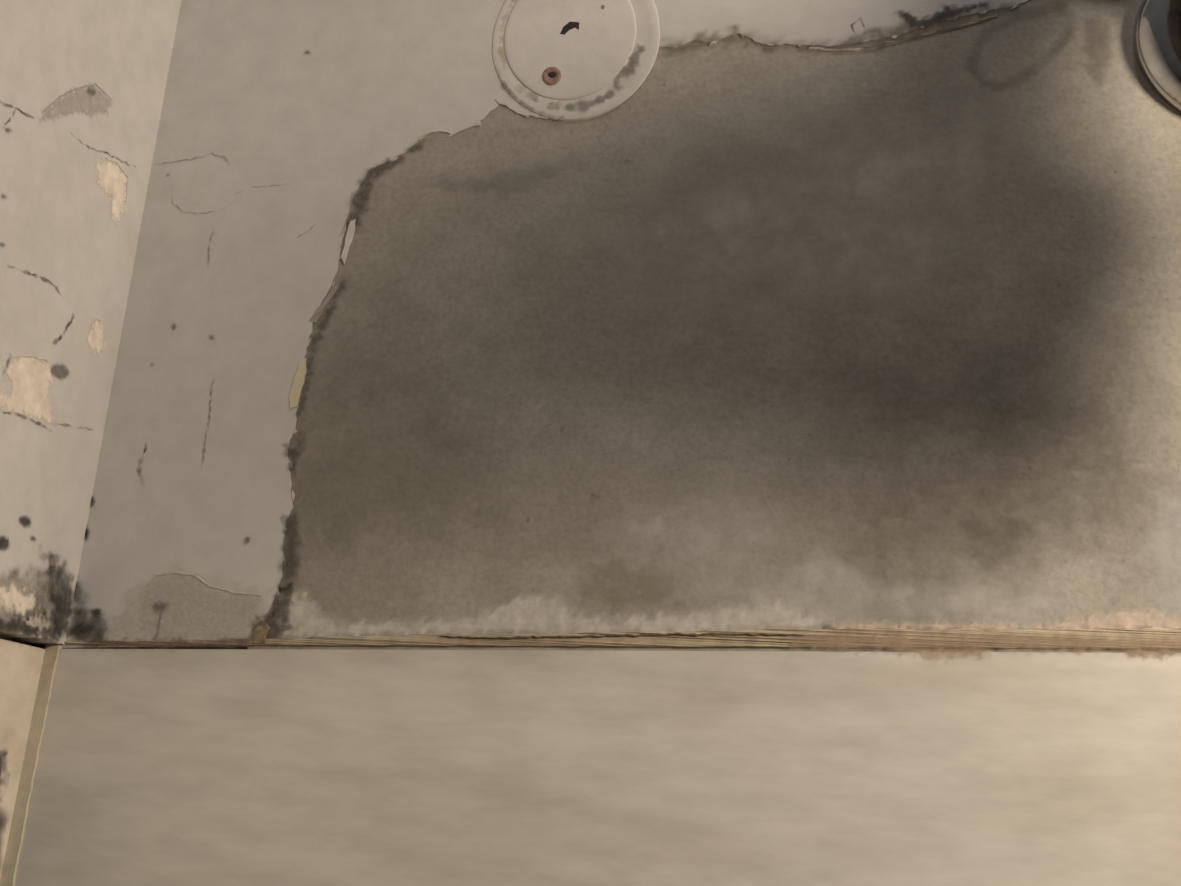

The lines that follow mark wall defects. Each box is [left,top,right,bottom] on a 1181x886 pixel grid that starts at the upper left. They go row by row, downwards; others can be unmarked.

spalling [42,83,112,118]
peeling [97,152,129,224]
peeling [248,0,1181,653]
peeling [0,355,69,427]
mould [0,554,103,642]